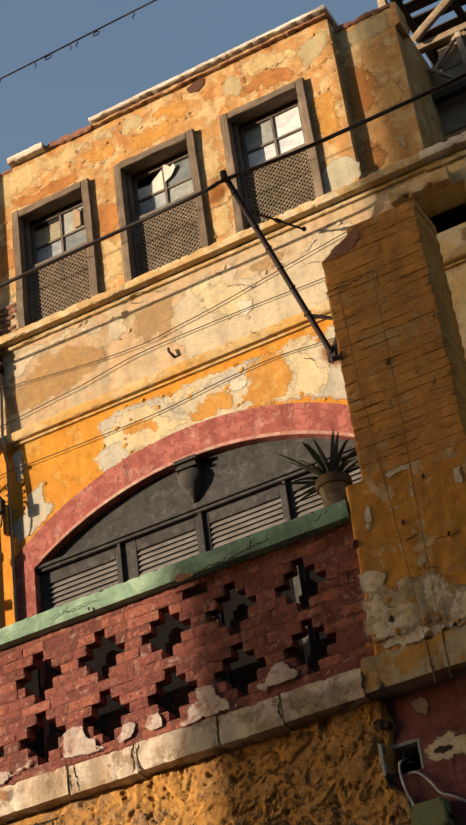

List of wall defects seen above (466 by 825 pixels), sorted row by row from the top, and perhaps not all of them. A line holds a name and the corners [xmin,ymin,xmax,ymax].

peeling [221,12,404,145]
peeling [0,78,204,208]
peeling [95,199,124,287]
flaking render [0,222,359,414]
crack [326,266,426,316]
flaking render [94,325,347,472]
flaking render [7,449,25,484]
flaking render [12,482,54,544]
peeling [357,552,466,648]
crack [129,740,137,772]
flaking render [424,723,466,763]